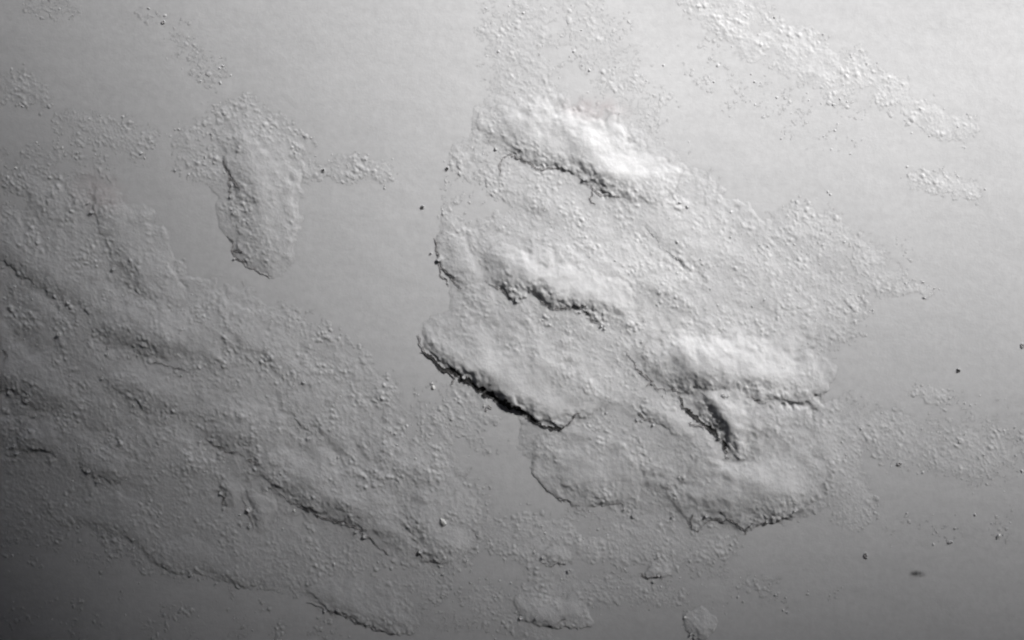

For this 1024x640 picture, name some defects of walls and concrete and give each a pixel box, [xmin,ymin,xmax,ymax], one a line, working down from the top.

crack [626,352,729,459]